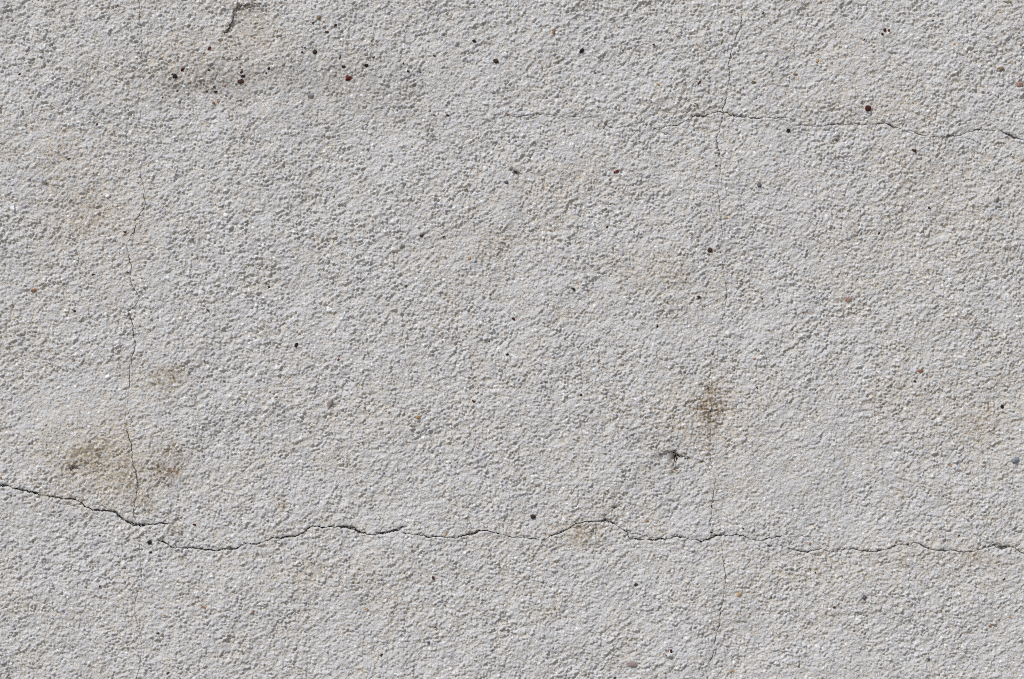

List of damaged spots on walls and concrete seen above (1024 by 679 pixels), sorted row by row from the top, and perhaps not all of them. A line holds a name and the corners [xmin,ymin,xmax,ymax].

crack [127,159,146,402]
crack [506,15,1020,433]
crack [0,426,1024,679]